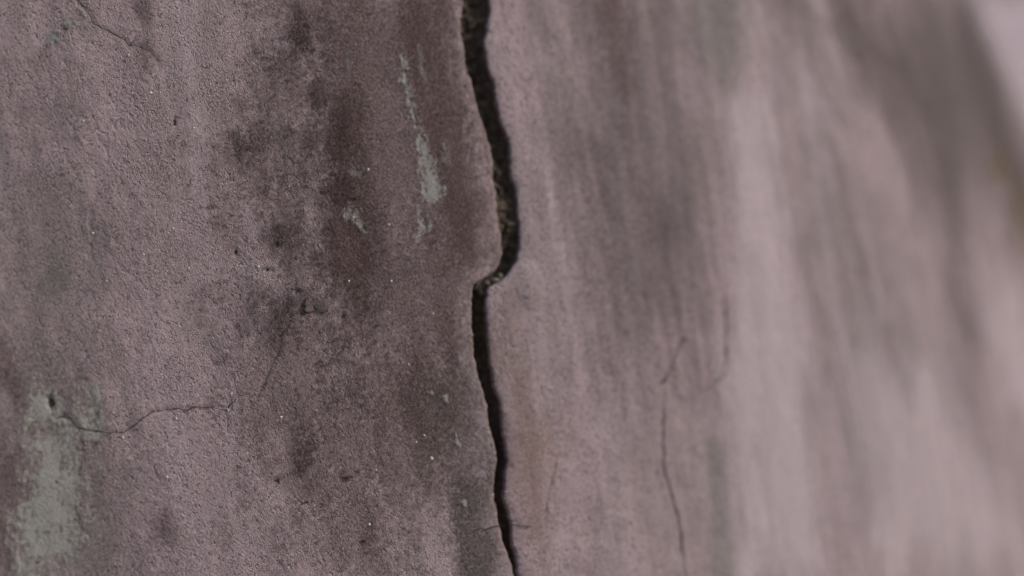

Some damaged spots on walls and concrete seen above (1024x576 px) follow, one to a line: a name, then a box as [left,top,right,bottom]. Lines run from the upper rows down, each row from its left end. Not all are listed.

crack [49,319,290,434]
crack [460,0,532,576]